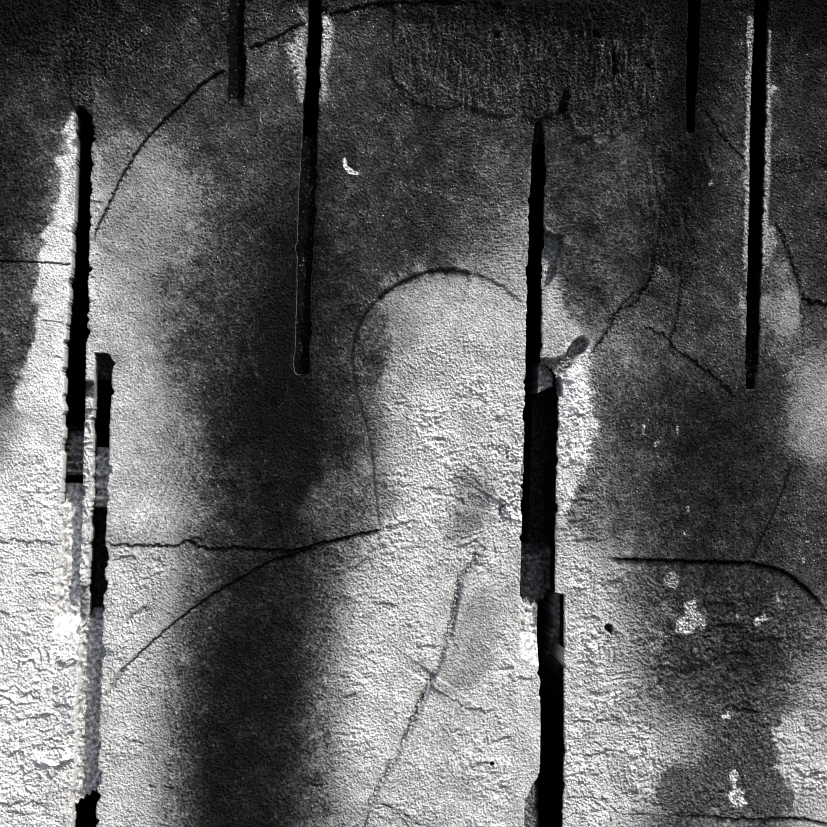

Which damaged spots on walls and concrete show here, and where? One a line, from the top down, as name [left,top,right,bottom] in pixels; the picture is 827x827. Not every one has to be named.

crack [0,259,72,267]
damp [0,0,73,415]
crack [91,69,226,243]
crack [774,223,827,358]
crack [106,537,258,552]
damp [166,118,390,827]
crack [294,267,526,554]
damp [604,343,826,717]
crack [102,605,197,698]
crack [364,532,498,827]
crack [565,796,827,826]
damp [658,814,796,827]